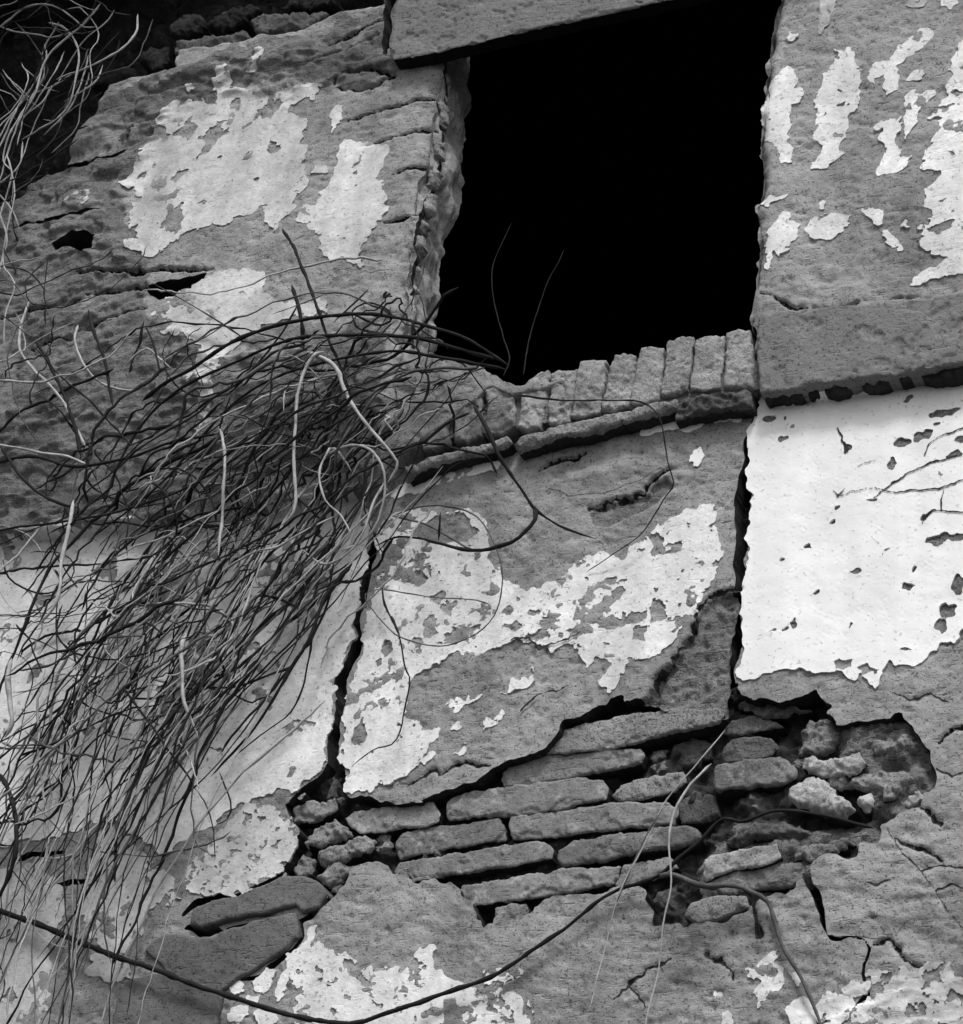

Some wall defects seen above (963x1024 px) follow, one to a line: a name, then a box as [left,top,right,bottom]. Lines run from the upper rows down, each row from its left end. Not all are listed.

peeling [118,63,391,268]
peeling [761,27,963,287]
crack [653,492,752,709]
spalling [0,385,963,983]
crack [893,692,948,702]
crack [337,763,345,775]
crack [920,807,944,827]
peeling [227,925,540,1024]
crack [817,900,835,941]
peeling [745,949,963,1024]
crack [873,938,922,968]
crack [886,827,963,930]